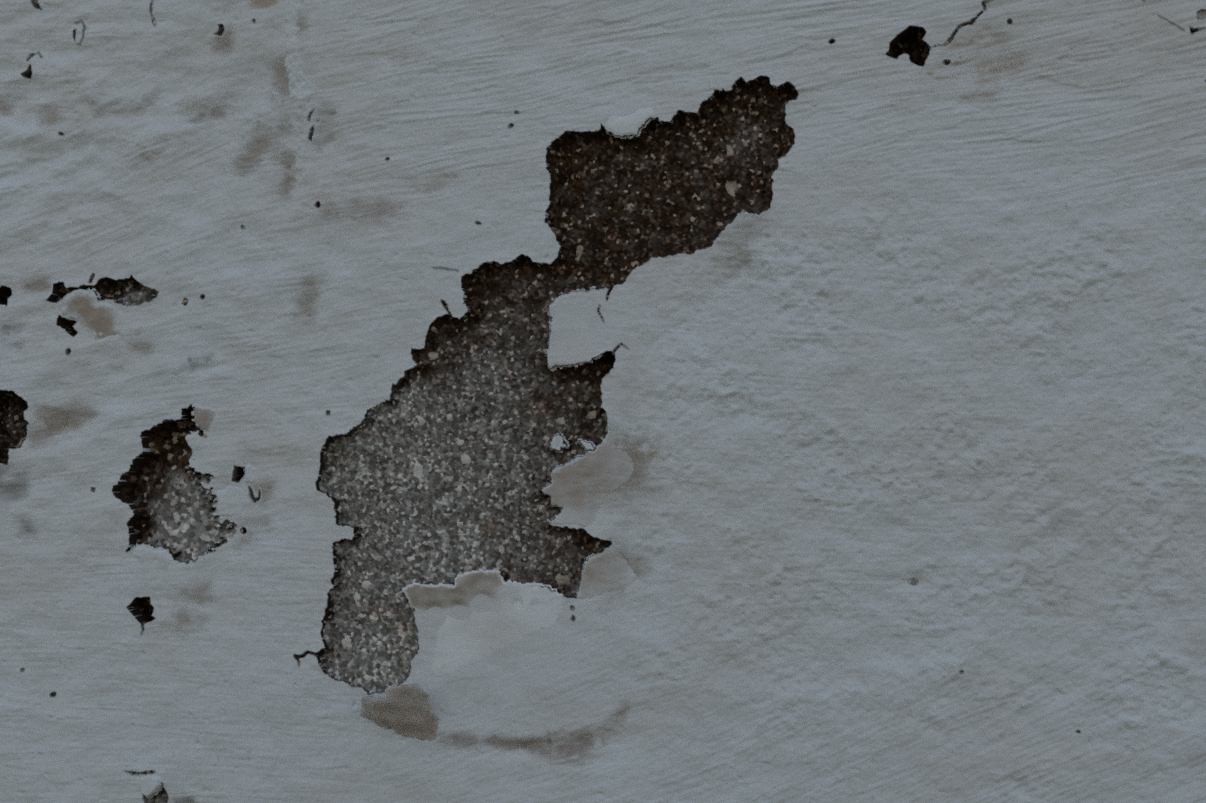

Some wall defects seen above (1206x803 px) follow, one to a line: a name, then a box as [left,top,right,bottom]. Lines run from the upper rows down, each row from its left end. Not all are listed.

crack [928,2,986,49]
spalling [889,31,929,66]
spalling [55,272,158,305]
spalling [62,318,77,335]
spalling [0,392,28,462]
spalling [295,78,798,741]
spalling [120,406,261,570]
spalling [134,597,154,631]
peeling [130,770,168,803]